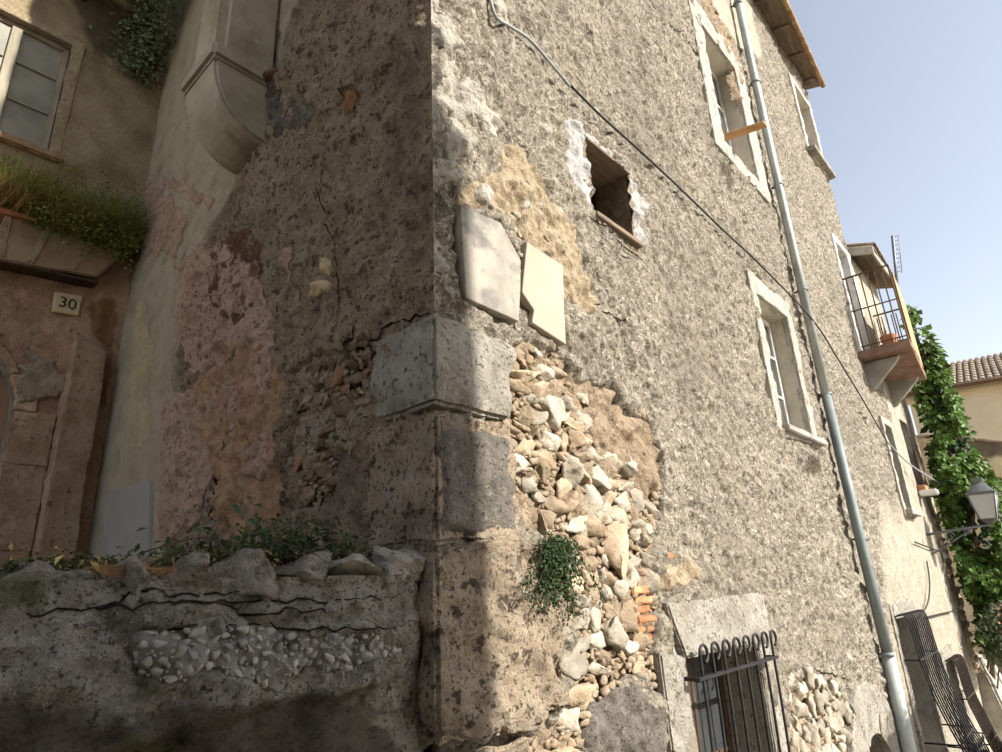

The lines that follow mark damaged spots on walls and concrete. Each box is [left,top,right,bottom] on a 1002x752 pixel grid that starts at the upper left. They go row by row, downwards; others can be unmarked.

flaking render [431,0,598,315]
crack [27,581,423,669]